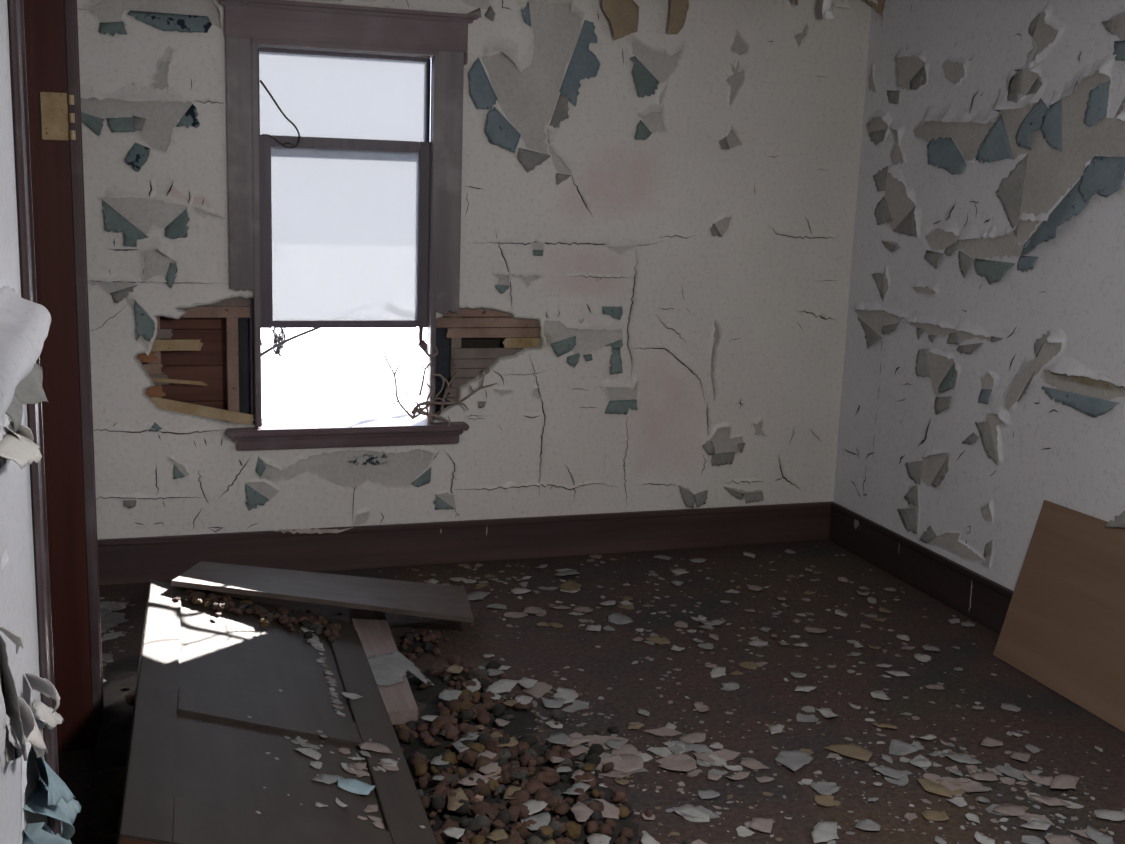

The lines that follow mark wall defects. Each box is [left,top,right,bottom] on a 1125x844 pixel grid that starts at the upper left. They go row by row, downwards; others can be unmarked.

peeling [83,0,224,37]
peeling [80,45,200,172]
peeling [469,0,600,185]
peeling [853,1,1125,415]
peeling [0,363,48,474]
spalling [88,185,255,434]
peeling [243,445,459,511]
spalling [435,303,640,419]
crack [420,174,931,516]
peeling [898,447,995,571]
peeling [962,324,1125,467]
peeling [0,626,81,844]